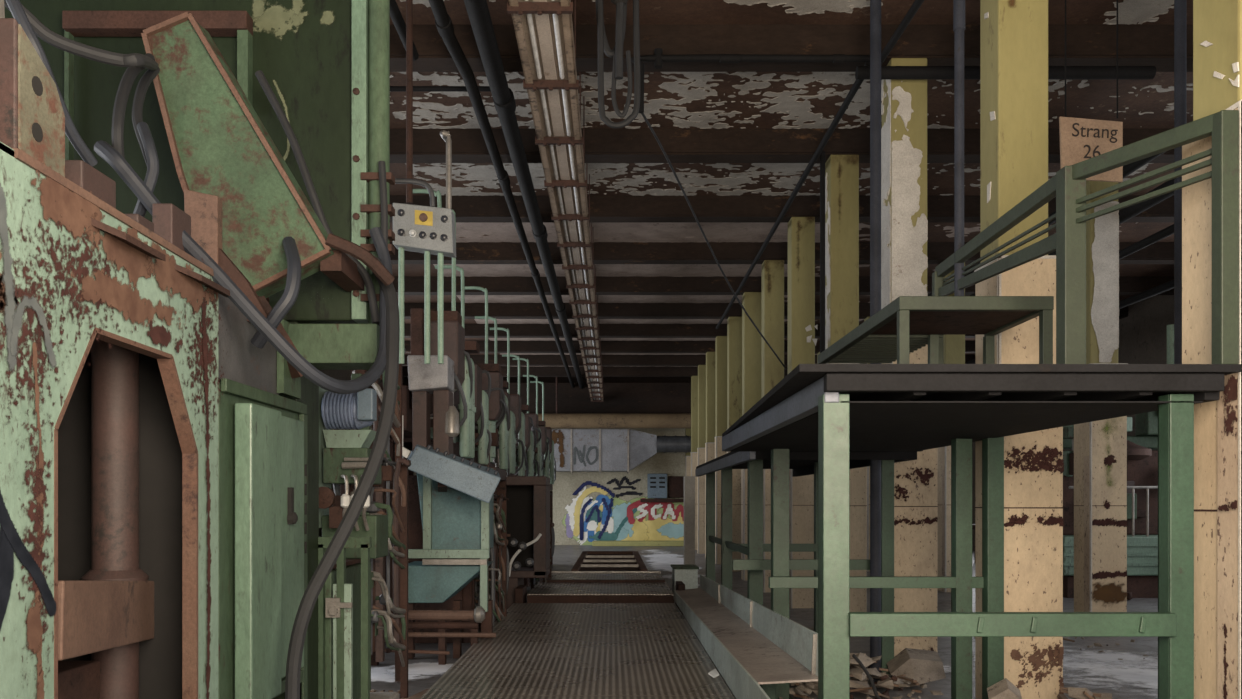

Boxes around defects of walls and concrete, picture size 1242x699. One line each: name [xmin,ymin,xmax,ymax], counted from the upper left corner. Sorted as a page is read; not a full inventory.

peeling [724,0,883,15]
peeling [390,72,501,129]
peeling [405,163,547,196]
peeling [577,72,991,309]
peeling [585,163,830,367]
peeling [1091,201,1139,363]
rust [27,162,218,699]
rust [1004,441,1064,475]
rust [1215,375,1237,436]
rust [1004,513,1063,527]
rust [1092,570,1127,603]
rust [1010,642,1064,699]